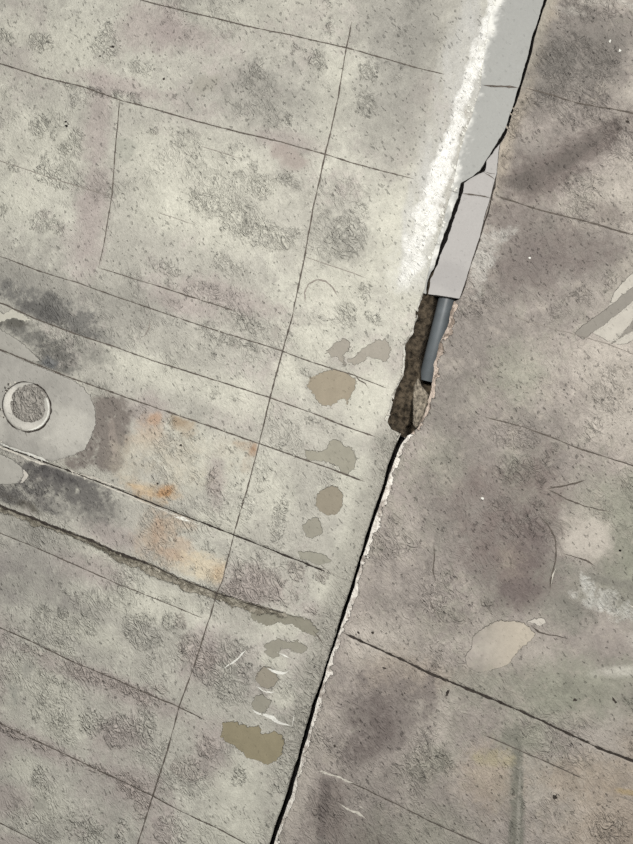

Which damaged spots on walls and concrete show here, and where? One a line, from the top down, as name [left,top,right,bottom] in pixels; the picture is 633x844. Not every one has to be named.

leakage [0,268,156,539]
crack [0,504,285,614]
crack [0,432,328,573]
peeling [0,438,359,844]
crack [304,279,337,299]
spalling [274,280,460,844]
leakage [381,0,501,304]
crack [270,437,633,844]
crack [436,0,547,296]